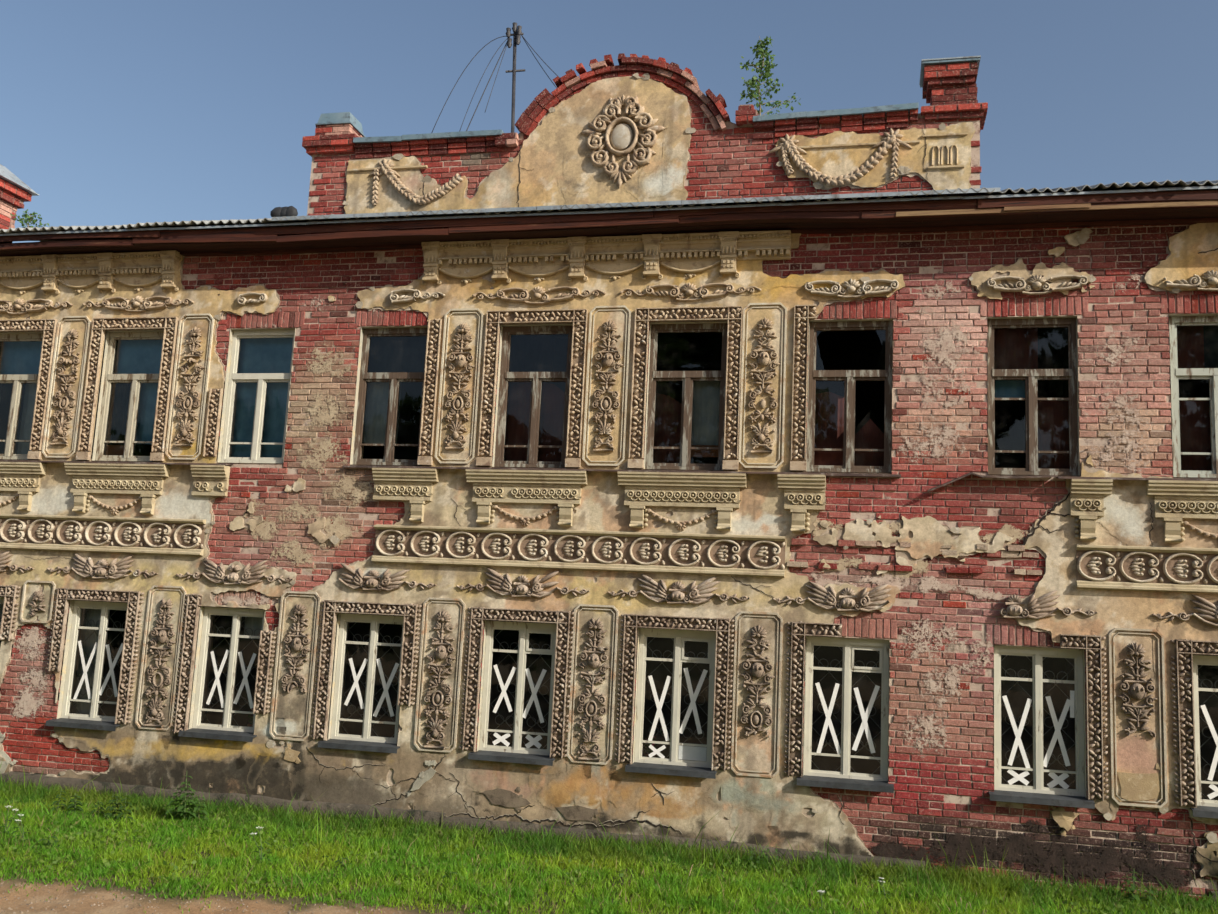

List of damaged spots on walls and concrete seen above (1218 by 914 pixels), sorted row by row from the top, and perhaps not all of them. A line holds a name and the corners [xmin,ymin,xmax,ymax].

flaking render [182,249,428,592]
flaking render [0,606,110,776]
flaking render [215,589,279,630]
crack [306,747,682,834]
damp [54,605,1218,889]
flaking render [763,224,1218,903]
crack [1017,492,1070,556]